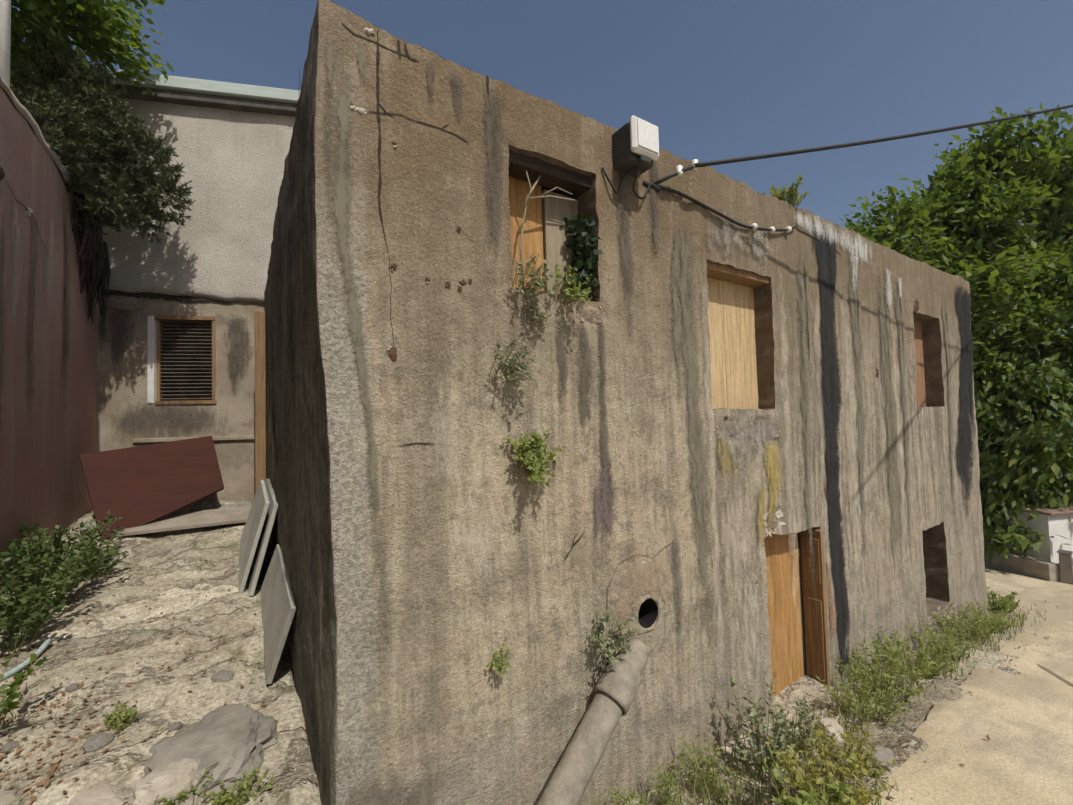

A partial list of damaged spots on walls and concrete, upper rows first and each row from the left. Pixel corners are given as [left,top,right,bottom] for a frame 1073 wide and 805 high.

damp [227,317,251,376]
damp [323,44,379,509]
crack [342,23,470,345]
damp [556,318,614,547]
damp [619,171,634,334]
damp [670,230,720,648]
flaking render [714,414,781,464]
spalling [764,507,785,537]
damp [798,226,850,672]
damp [849,272,868,553]
damp [878,284,912,560]
damp [943,286,976,532]